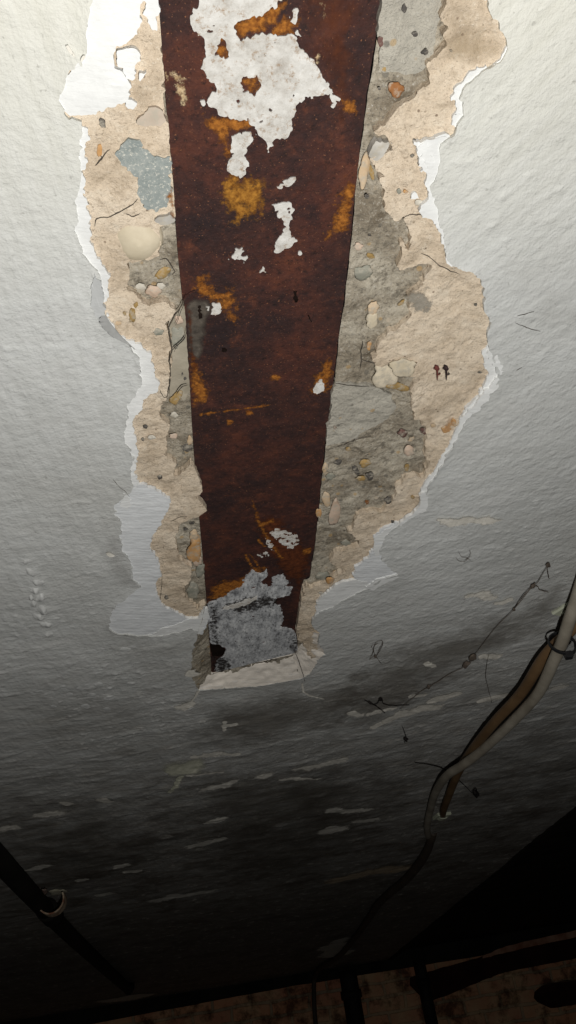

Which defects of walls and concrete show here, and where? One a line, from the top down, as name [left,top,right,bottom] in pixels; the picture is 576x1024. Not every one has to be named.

corrosion [236,2,299,36]
corrosion [165,72,187,106]
corrosion [206,117,251,154]
corrosion [223,175,264,223]
corrosion [327,184,355,238]
corrosion [193,275,235,322]
corrosion [191,354,269,425]
flaking render [59,0,513,711]
corrosion [311,360,332,392]
corrosion [252,505,311,583]
corrosion [208,554,266,599]